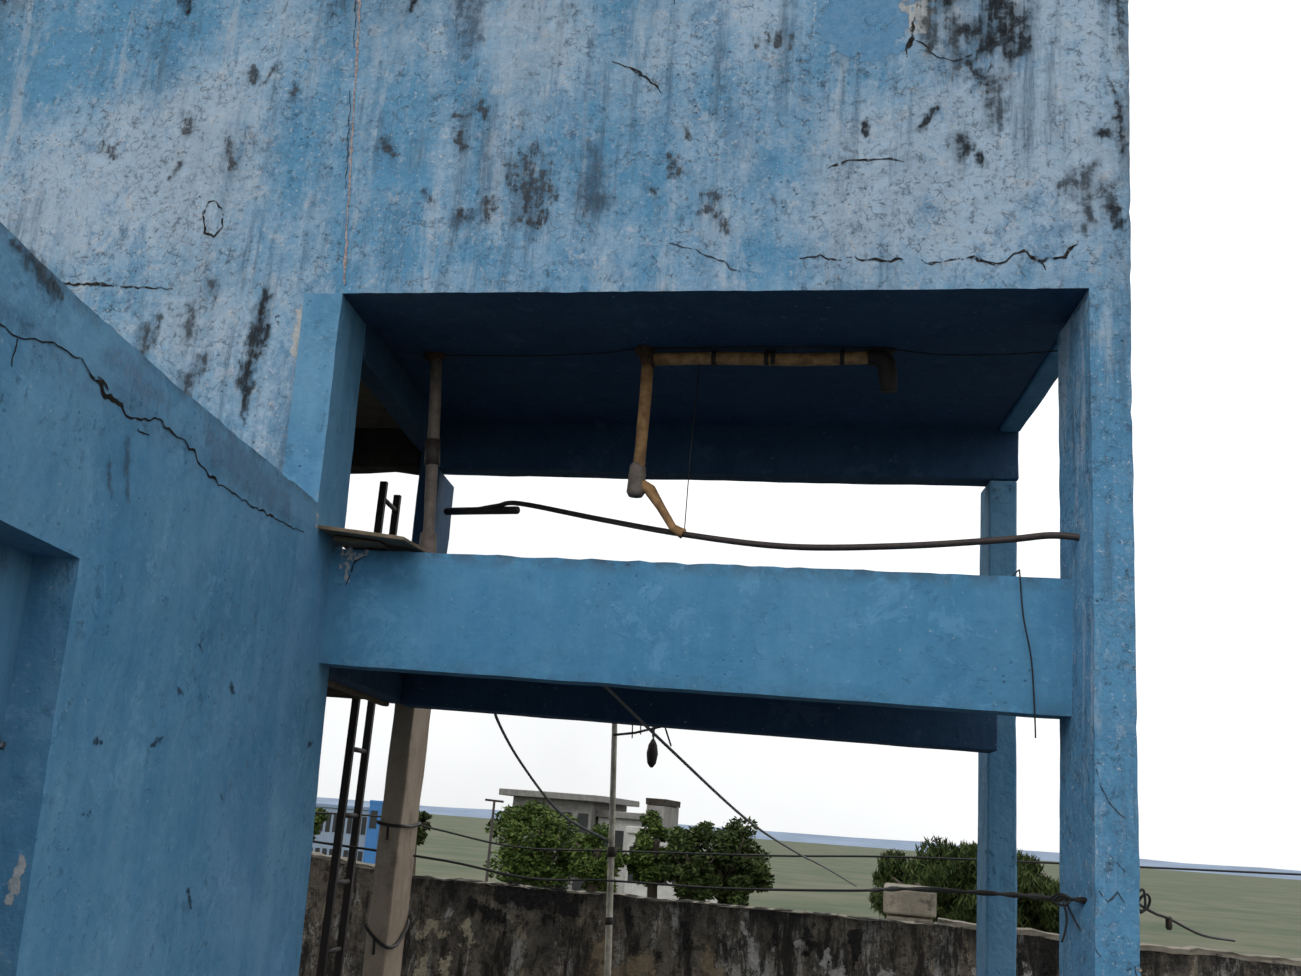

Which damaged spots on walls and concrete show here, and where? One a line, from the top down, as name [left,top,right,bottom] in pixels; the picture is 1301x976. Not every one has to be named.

crack [612,61,661,93]
damp [754,29,794,51]
damp [916,0,1032,131]
crack [344,90,352,189]
damp [1096,83,1129,153]
damp [454,142,559,232]
damp [1057,161,1123,236]
crack [63,282,173,290]
crack [799,244,1077,270]
damp [236,288,273,421]
crack [0,323,304,532]
peeling [4,854,26,905]